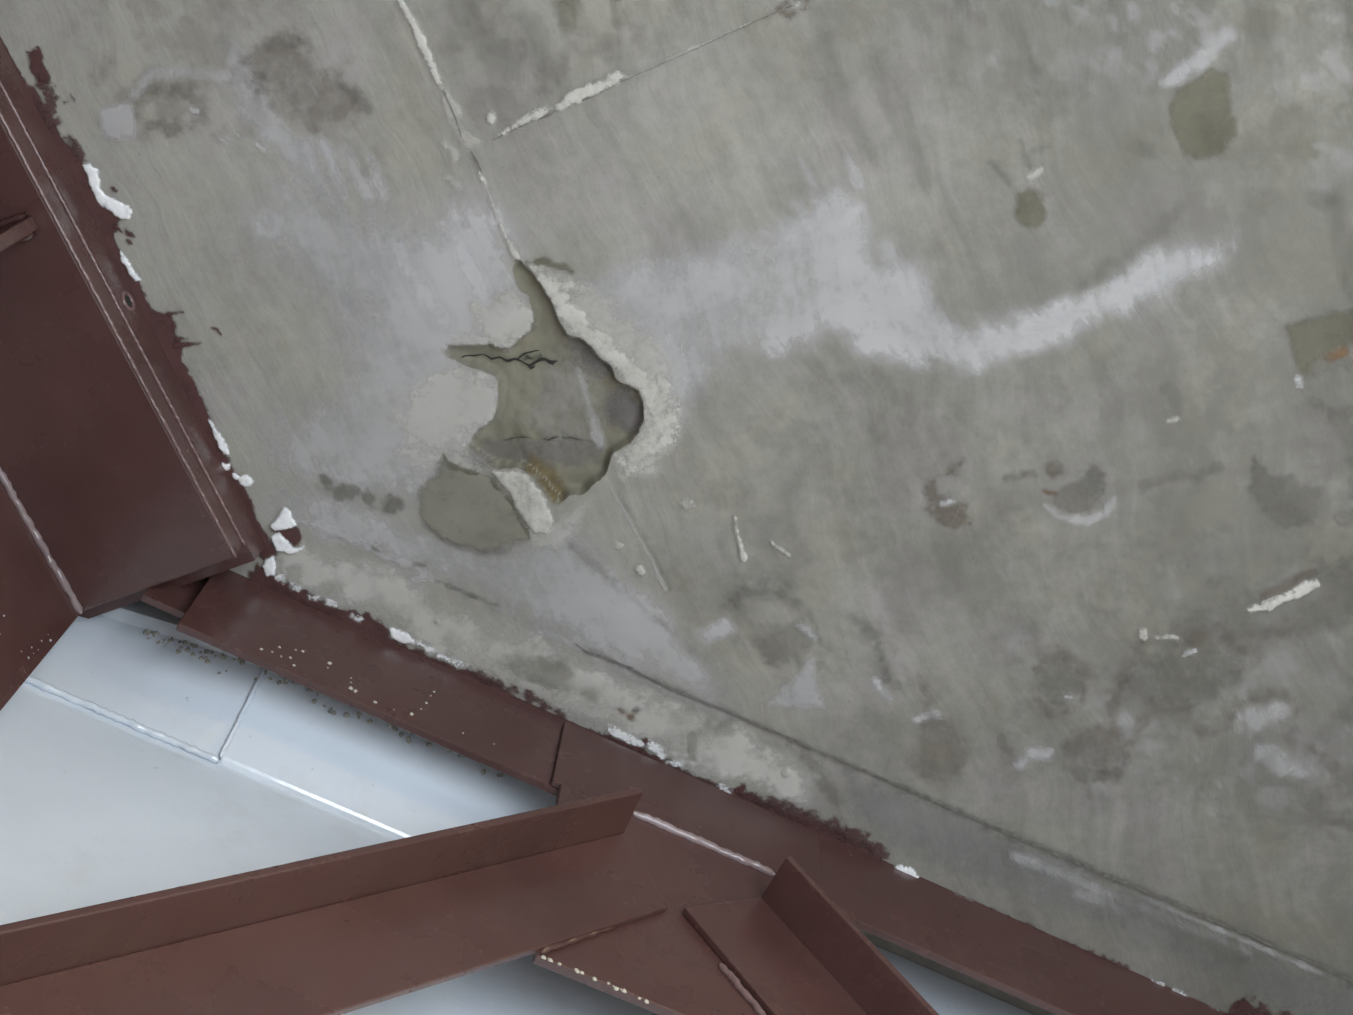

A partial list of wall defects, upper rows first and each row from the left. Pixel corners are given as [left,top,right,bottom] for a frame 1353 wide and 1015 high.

damp [101,104,134,139]
damp [1170,68,1237,157]
damp [1016,168,1045,227]
crack [462,350,558,369]
damp [220,47,822,802]
spalling [445,258,645,505]
damp [529,195,1214,478]
peeling [1247,604,1267,612]